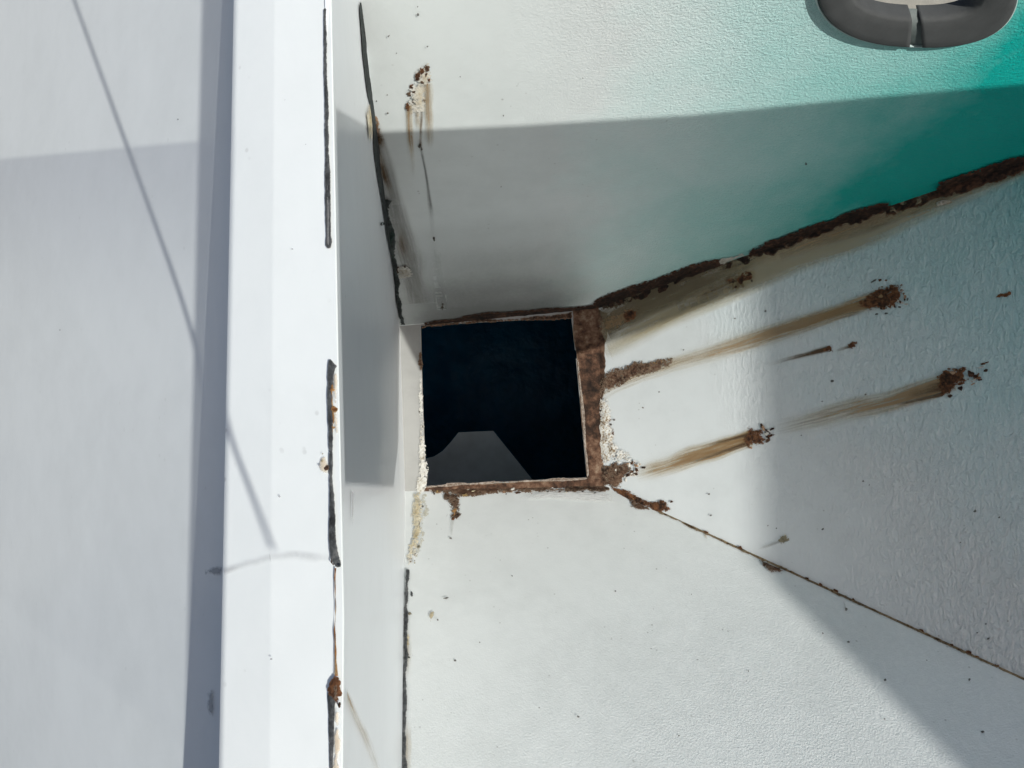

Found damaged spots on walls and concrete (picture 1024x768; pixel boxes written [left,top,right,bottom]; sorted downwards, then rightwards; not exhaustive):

rust [406,63,433,147]
rust [703,271,753,296]
rust [422,279,909,520]
rust [822,361,989,418]
crack [657,511,1024,680]
rust [327,676,342,768]